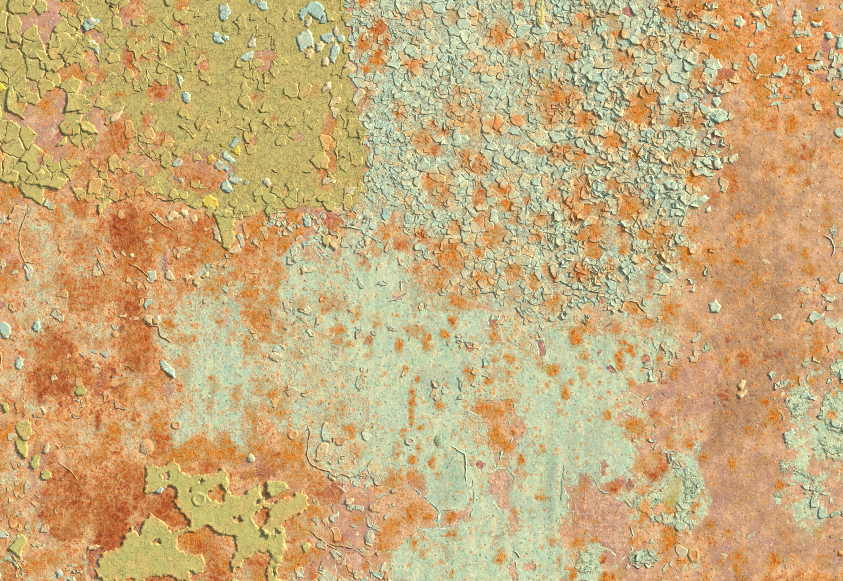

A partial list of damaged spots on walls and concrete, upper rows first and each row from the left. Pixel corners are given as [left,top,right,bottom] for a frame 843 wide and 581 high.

crack [0,0,380,264]
peeling [126,0,843,405]
corrosion [34,444,230,581]
peeling [111,298,161,331]
corrosion [39,212,305,401]
corrosion [150,386,324,580]
peeling [55,397,516,581]
corrosion [407,275,488,349]
corrosion [477,399,525,465]
corrosion [610,318,637,371]
peeling [564,422,705,581]
peeling [769,350,843,462]